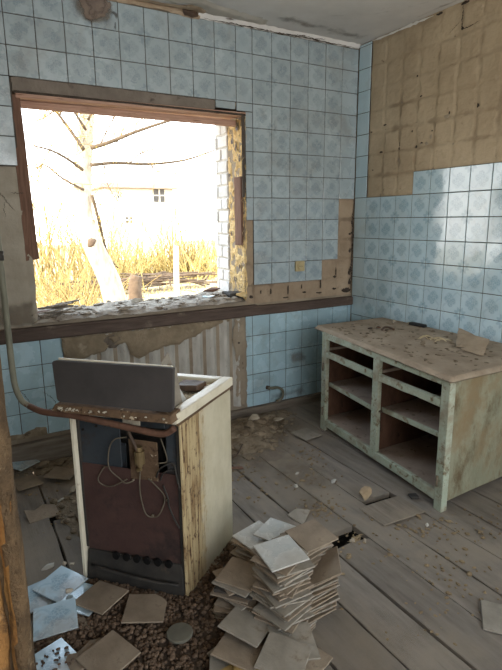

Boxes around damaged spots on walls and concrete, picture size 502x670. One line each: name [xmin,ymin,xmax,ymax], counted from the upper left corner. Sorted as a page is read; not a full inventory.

peeling [367,0,502,197]
flaking render [0,166,38,329]
peeling [225,117,353,304]
peeling [61,318,248,407]